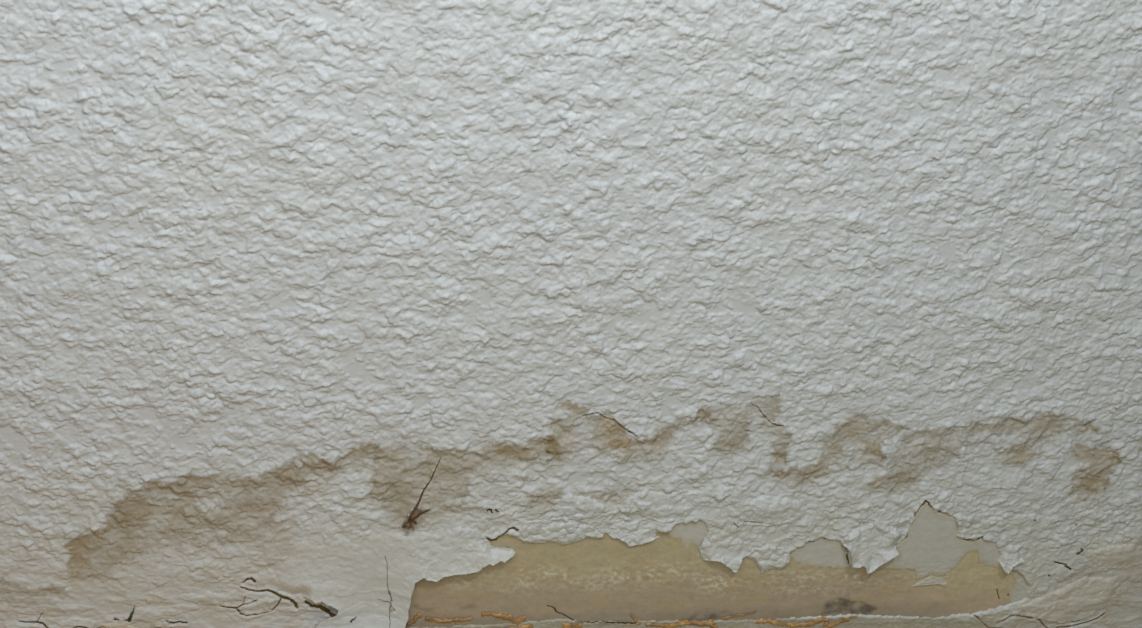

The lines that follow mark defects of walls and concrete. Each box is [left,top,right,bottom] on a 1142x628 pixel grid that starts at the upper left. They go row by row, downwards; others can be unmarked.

crack [407,458,441,529]
crack [19,606,135,628]
crack [222,577,356,623]
crack [377,557,395,628]
peeling [263,502,1029,628]